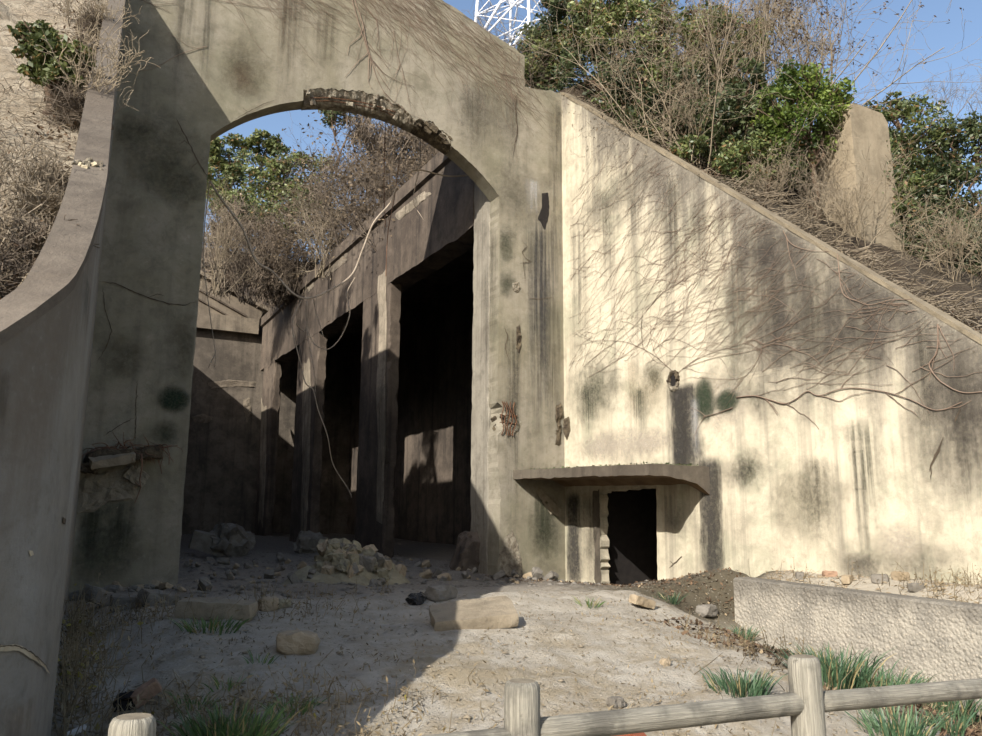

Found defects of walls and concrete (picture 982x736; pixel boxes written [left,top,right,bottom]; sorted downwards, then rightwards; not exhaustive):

spalling [301,88,453,155]
crack [97,281,194,362]
spalling [63,465,141,524]
leakage [670,385,723,571]
leakage [567,495,580,582]
crack [0,644,49,673]